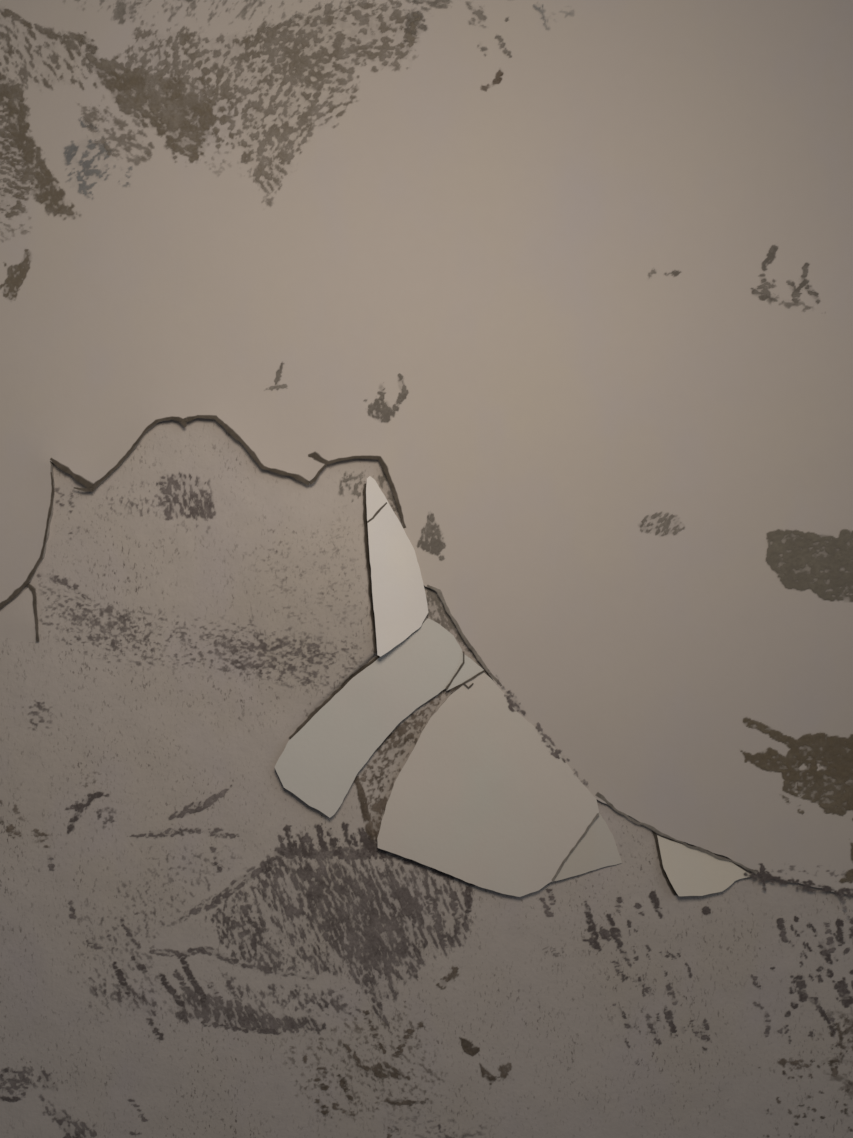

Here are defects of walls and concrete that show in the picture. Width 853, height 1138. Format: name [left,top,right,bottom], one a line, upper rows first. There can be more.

peeling [0,0,450,218]
peeling [0,418,853,1138]